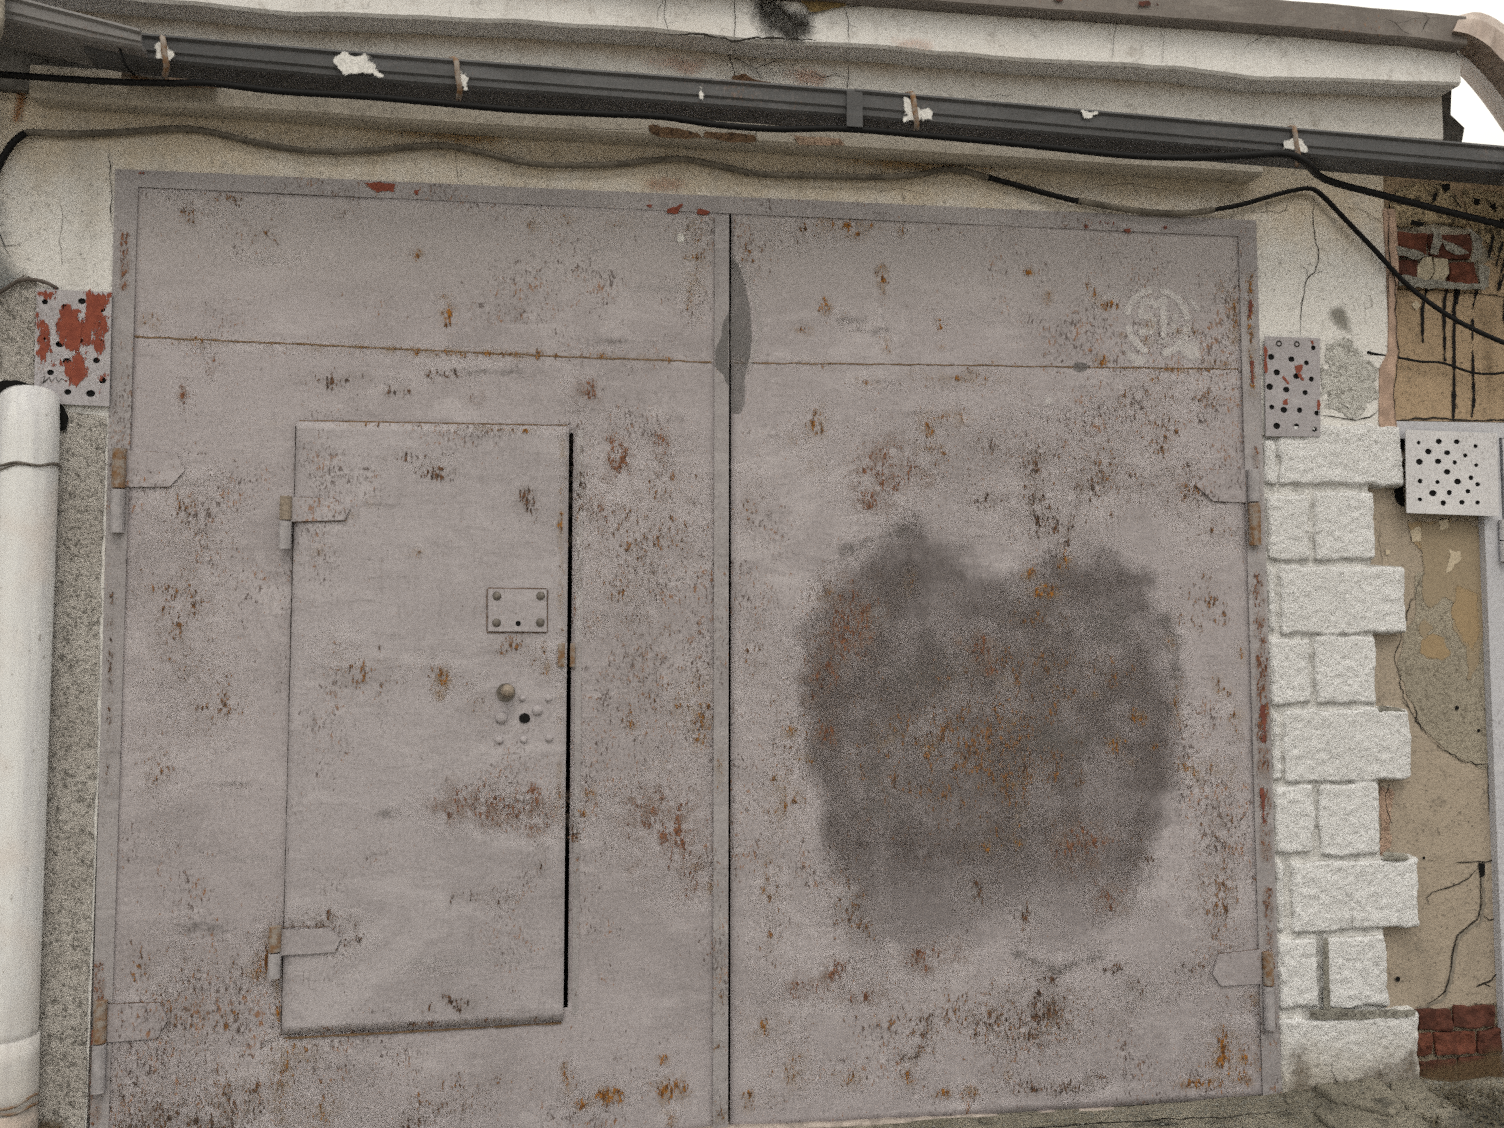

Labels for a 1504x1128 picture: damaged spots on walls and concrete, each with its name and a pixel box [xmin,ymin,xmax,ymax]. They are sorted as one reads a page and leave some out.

crack [657,0,859,88]
flaking render [1390,182,1504,310]
crack [1256,196,1504,427]
rust [729,274,1275,1103]
peeling [1394,486,1488,769]
crack [1394,575,1490,816]
rust [433,781,596,843]
peeling [1379,787,1395,856]
crack [1418,860,1496,1009]
rust [379,1056,625,1128]
rust [647,1054,692,1127]
flaking render [1414,1001,1503,1077]